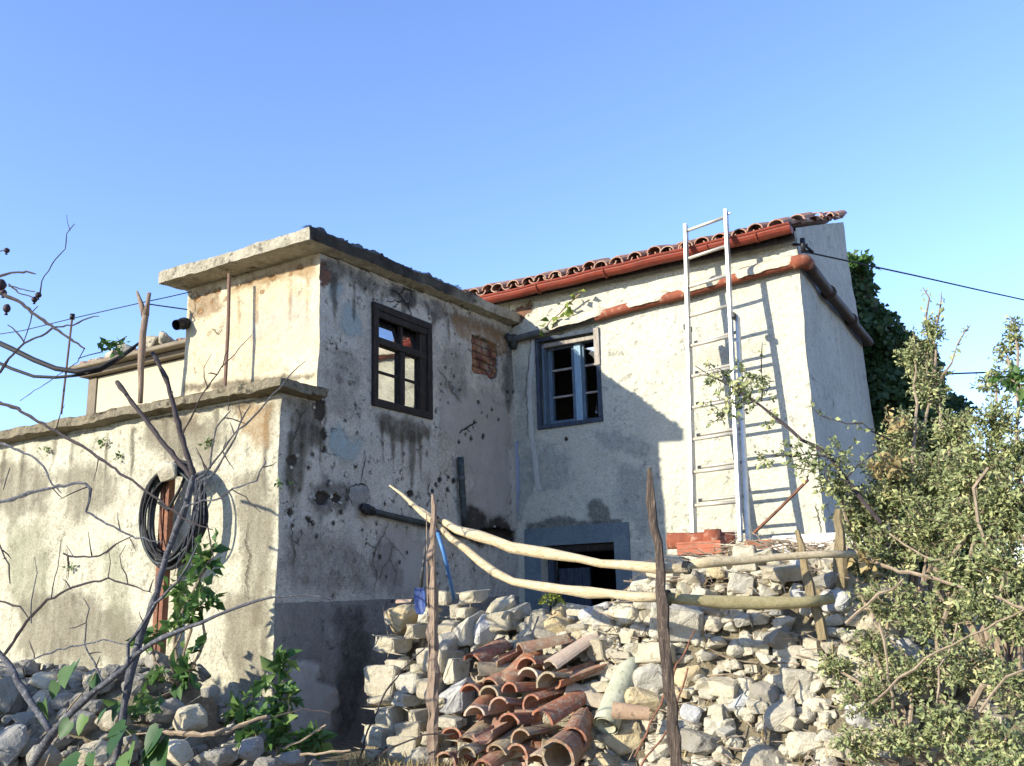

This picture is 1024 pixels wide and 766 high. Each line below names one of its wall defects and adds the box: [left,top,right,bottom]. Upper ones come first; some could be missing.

flaking render [451,332,501,382]
water stain [147,400,253,465]
water stain [381,414,429,492]
flaking render [313,479,343,525]
water stain [226,434,270,691]